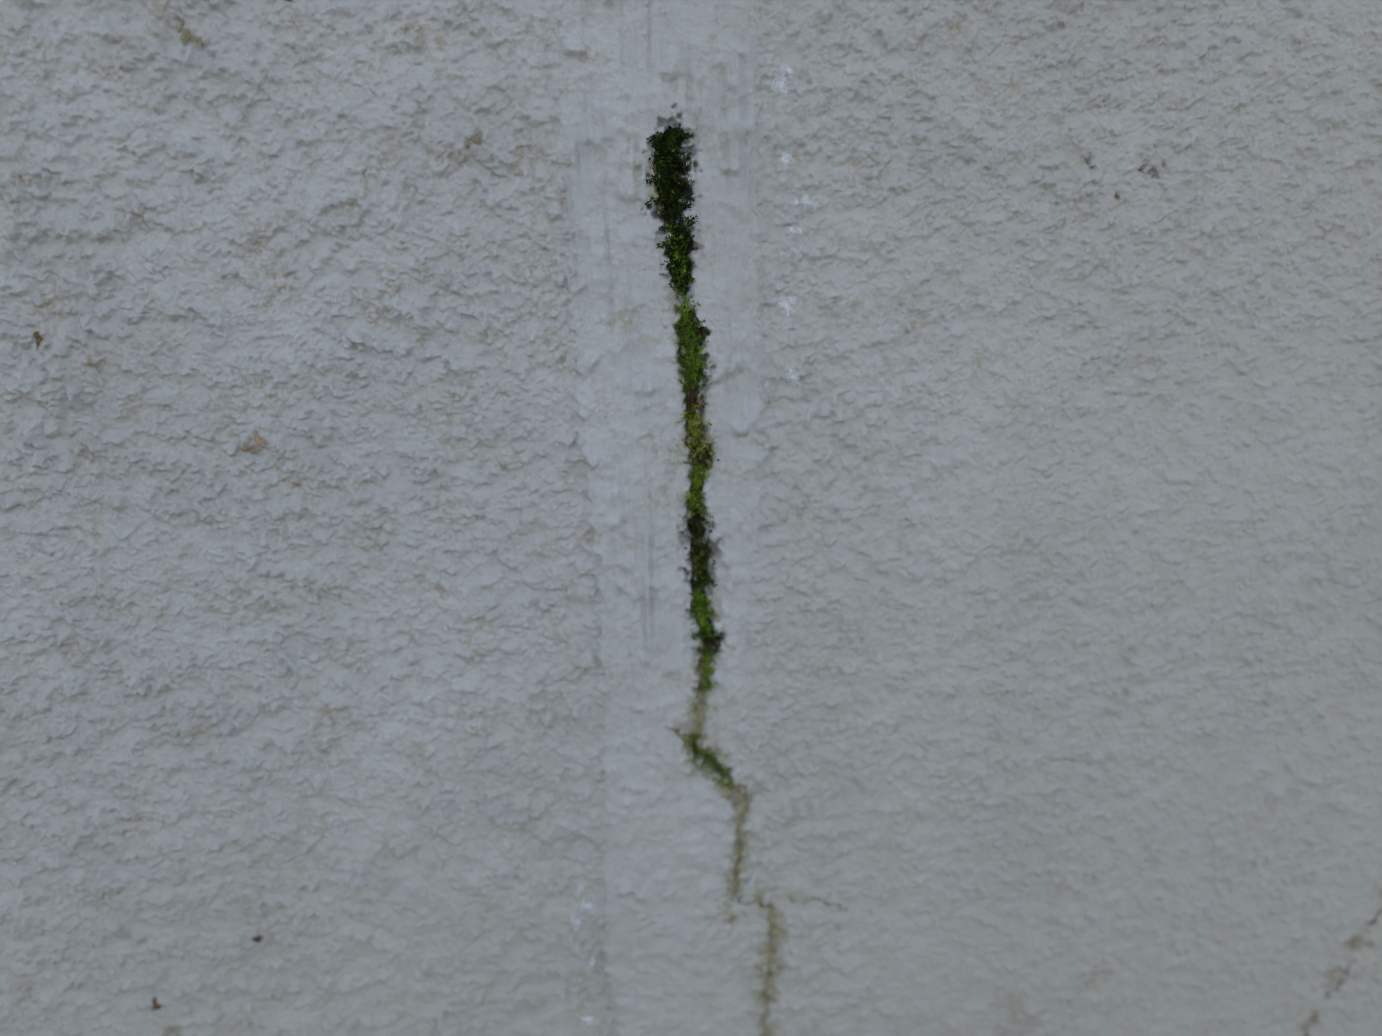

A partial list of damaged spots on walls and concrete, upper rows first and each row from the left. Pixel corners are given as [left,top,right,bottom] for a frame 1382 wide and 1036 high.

crack [650,125,847,1026]